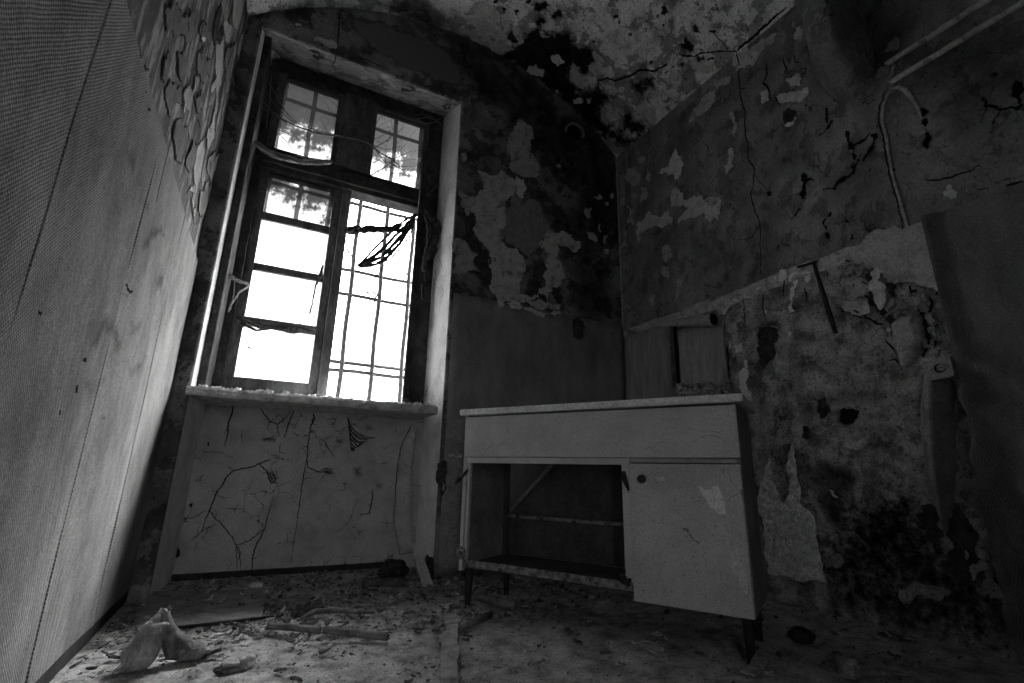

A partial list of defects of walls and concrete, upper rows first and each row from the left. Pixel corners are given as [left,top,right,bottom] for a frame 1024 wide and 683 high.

peeling [162,0,248,224]
peeling [457,1,557,55]
peeling [527,51,605,104]
peeling [451,119,721,315]
crack [597,7,807,321]
peeling [689,33,776,125]
peeling [759,74,809,104]
peeling [827,259,896,337]
flaking render [727,310,792,417]
crack [184,407,335,571]
crack [333,428,410,555]
damp [805,466,1009,651]